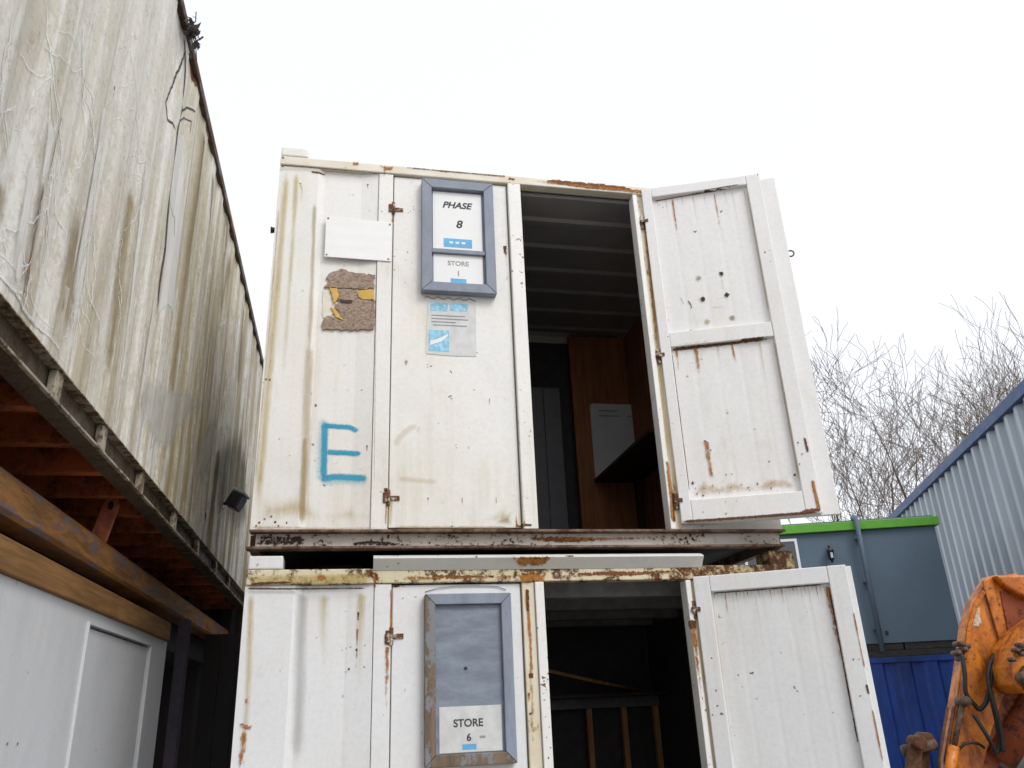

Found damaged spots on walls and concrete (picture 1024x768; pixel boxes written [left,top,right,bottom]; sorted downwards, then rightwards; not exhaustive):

damp [0,15,148,381]
damp [184,146,214,284]
peeling [322,269,375,331]
corrosion [644,227,657,333]
corrosion [671,337,766,487]
corrosion [516,519,644,543]
corrosion [666,462,820,523]
corrosion [384,544,550,725]
corrosion [688,620,699,671]
corrosion [716,584,870,742]
corrosion [239,723,251,765]